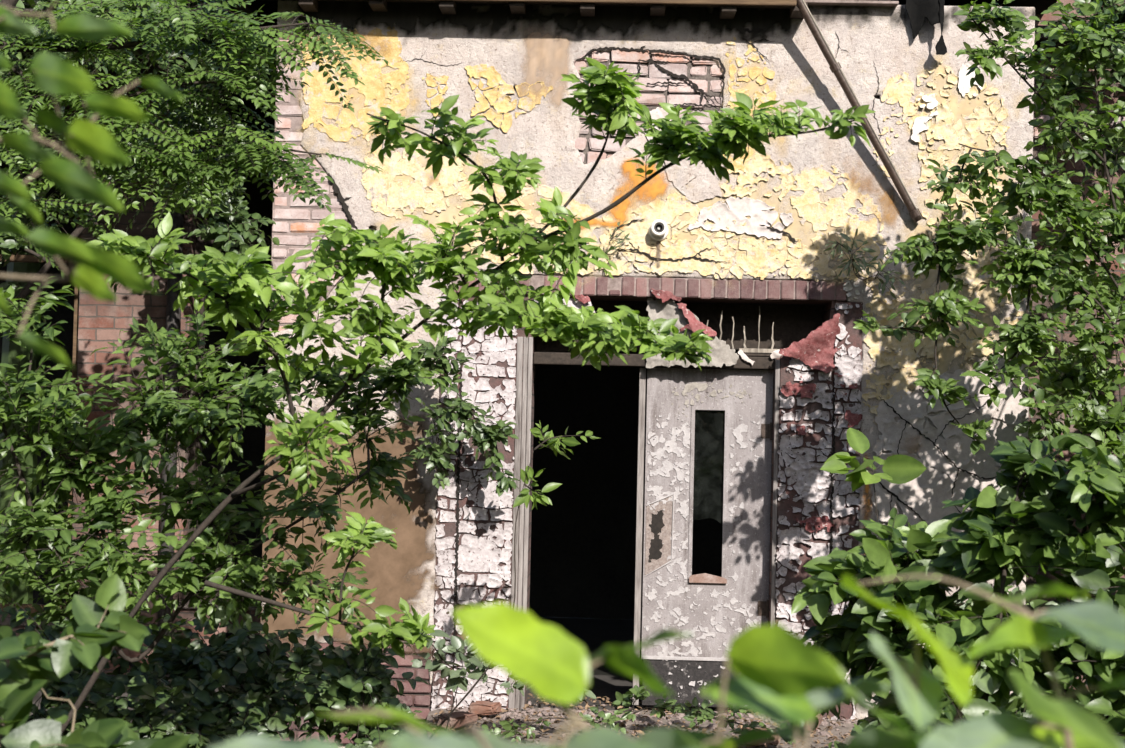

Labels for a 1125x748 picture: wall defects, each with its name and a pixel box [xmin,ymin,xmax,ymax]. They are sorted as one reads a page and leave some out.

peeling [431,294,518,711]
rust [564,158,667,228]
peeling [269,27,1025,645]
peeling [644,382,760,706]
crack [879,482,927,523]
crack [880,388,1004,513]